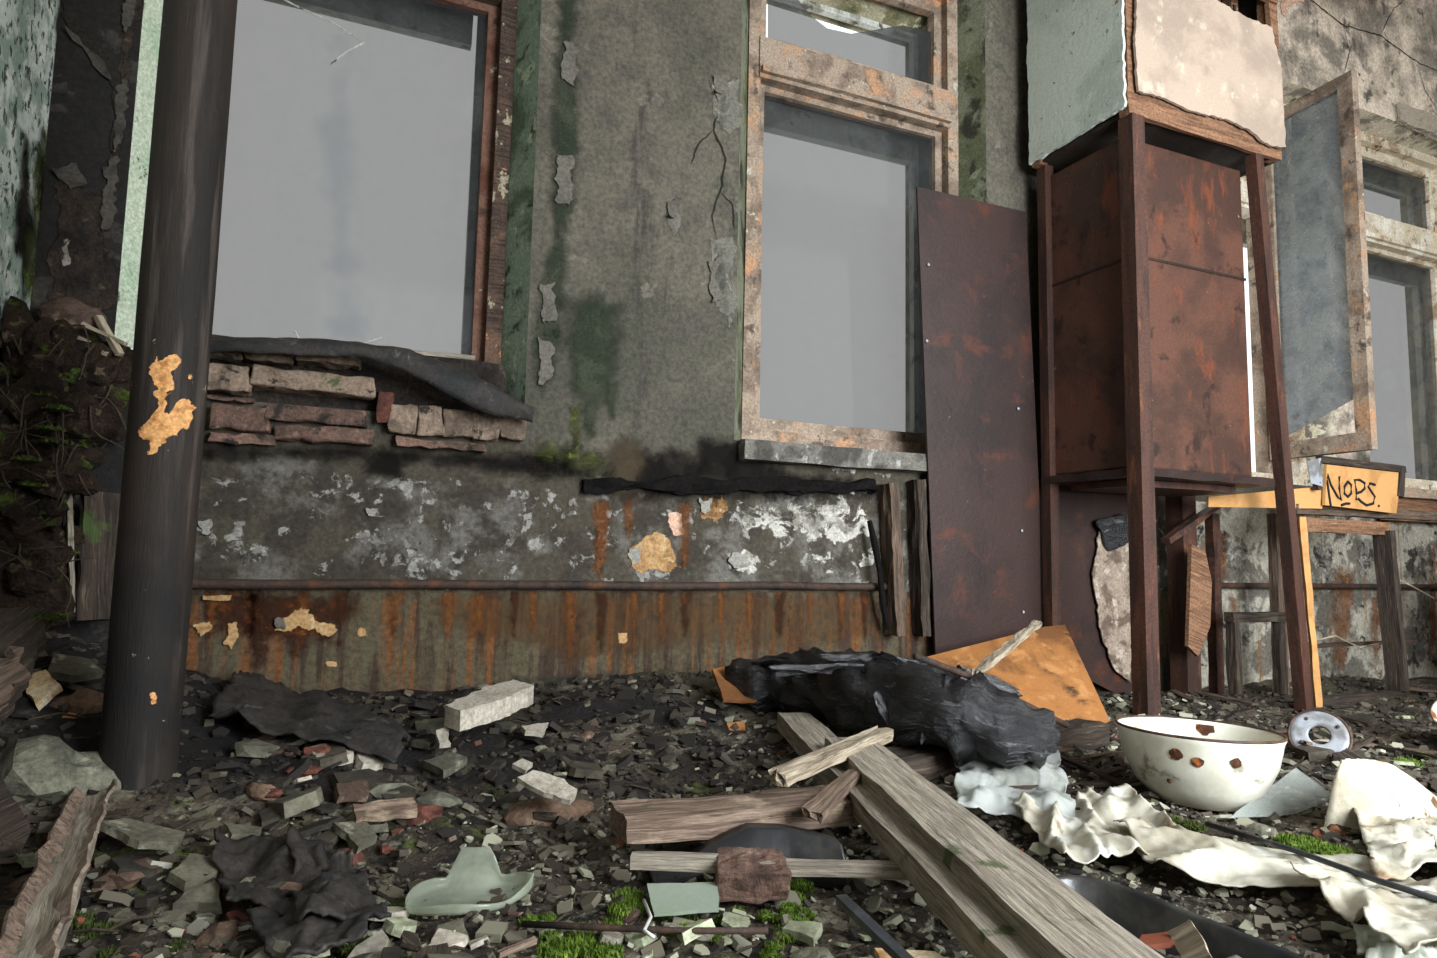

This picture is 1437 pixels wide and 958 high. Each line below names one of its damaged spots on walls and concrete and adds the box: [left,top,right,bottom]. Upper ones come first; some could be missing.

leakage [0,137,44,297]
spalling [45,0,145,316]
peeling [535,0,579,385]
crack [692,81,735,236]
peeling [138,354,196,455]
leakage [566,297,618,448]
peeling [352,508,422,567]
peeling [553,498,578,519]
peeling [626,510,683,574]
peeling [699,492,874,574]
corrosion [596,593,607,648]
corrosion [775,592,786,633]